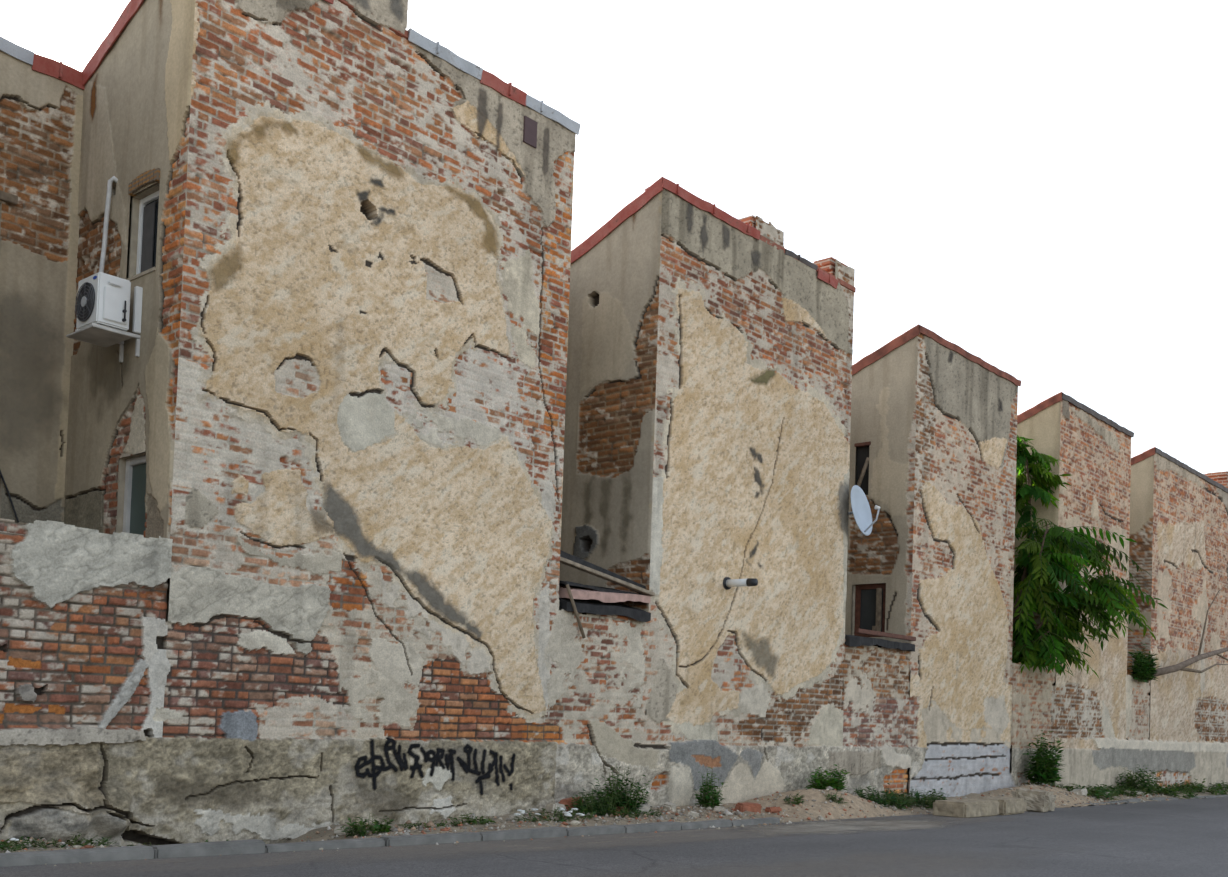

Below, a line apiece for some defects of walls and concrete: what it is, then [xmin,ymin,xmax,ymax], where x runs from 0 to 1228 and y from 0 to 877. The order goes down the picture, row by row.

leakage [391,0,402,19]
leakage [687,203,708,247]
spalling [0,0,855,744]
crack [0,744,155,836]
crack [185,746,335,822]
crack [379,803,467,811]
spalling [590,553,845,806]
crack [655,417,785,688]
spalling [847,333,1057,685]
spalling [1050,399,1228,752]